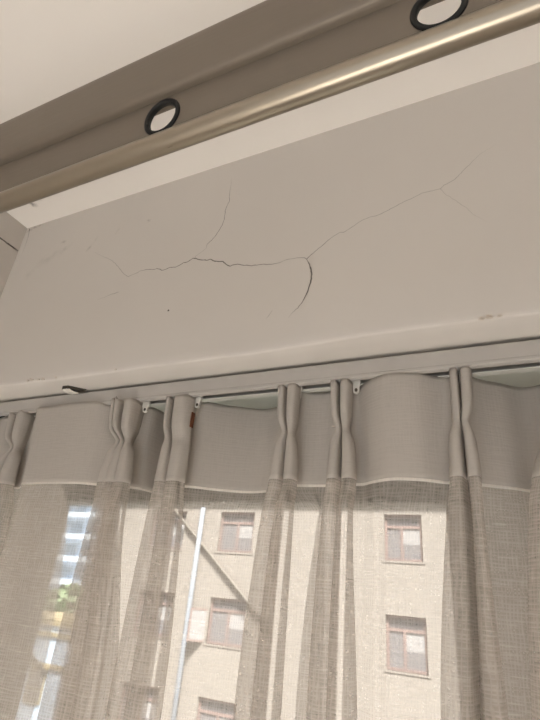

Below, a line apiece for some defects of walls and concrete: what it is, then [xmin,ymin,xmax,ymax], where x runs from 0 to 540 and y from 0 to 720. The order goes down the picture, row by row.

crack [148,258,269,271]
crack [298,241,327,307]